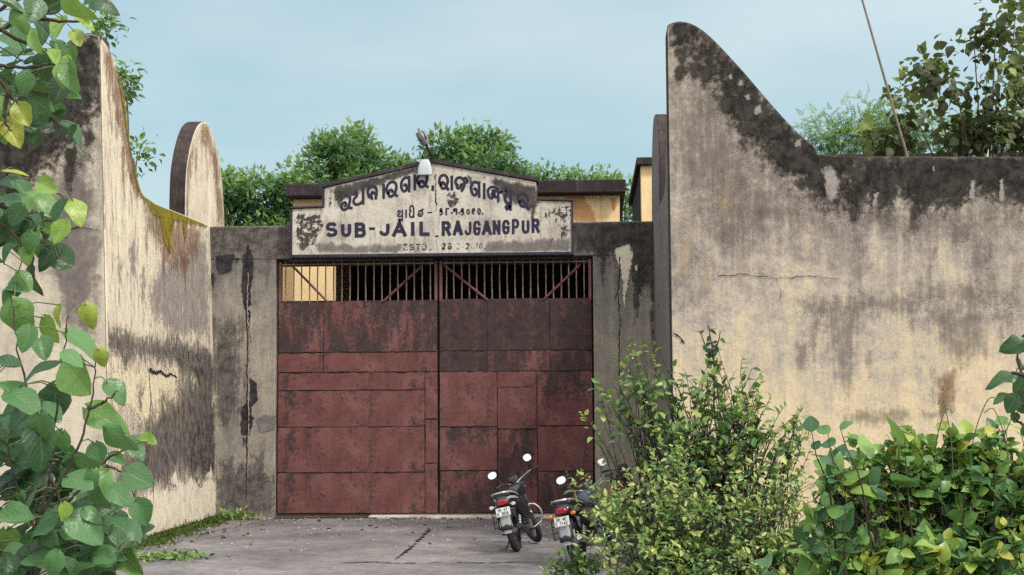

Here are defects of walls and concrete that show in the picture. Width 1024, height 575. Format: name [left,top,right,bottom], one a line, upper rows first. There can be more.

water stain [675,45,792,240]
water stain [47,113,101,332]
water stain [849,196,861,222]
water stain [909,184,931,231]
crack [720,273,833,300]
water stain [108,227,290,517]
rust [939,375,954,411]